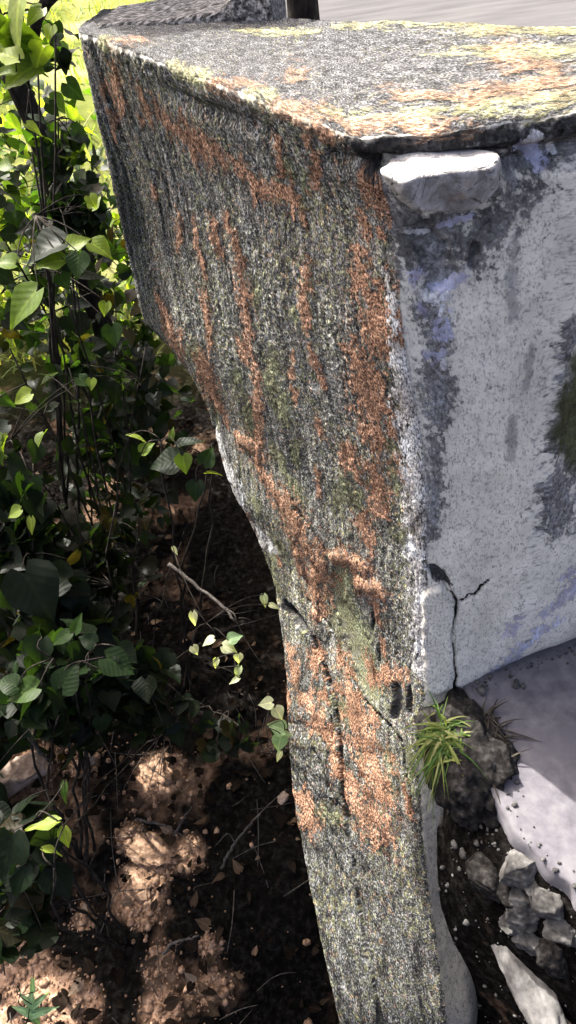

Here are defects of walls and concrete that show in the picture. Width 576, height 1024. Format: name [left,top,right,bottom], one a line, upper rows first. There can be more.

water stain [373,113,576,548]
crack [444,579,489,686]